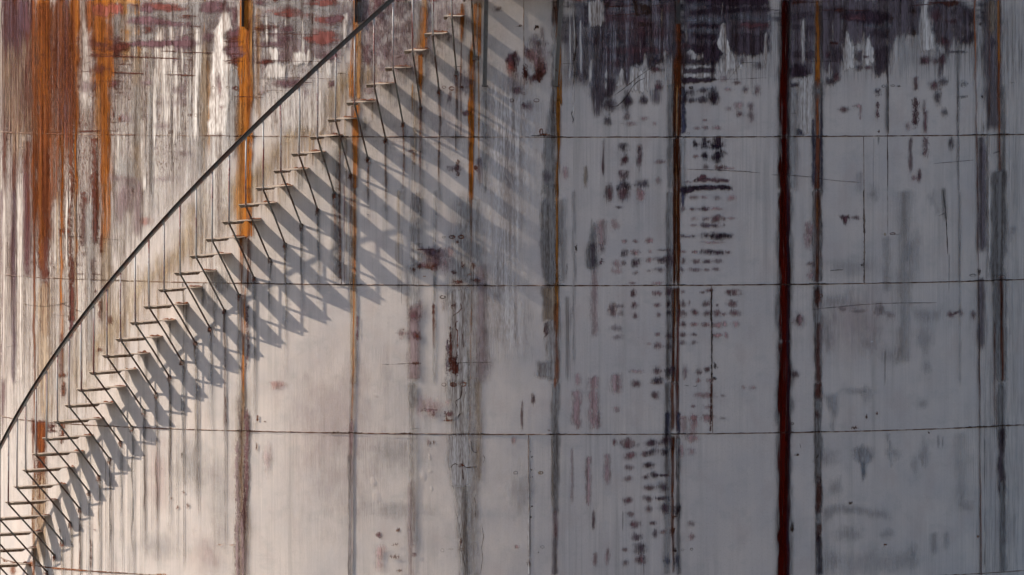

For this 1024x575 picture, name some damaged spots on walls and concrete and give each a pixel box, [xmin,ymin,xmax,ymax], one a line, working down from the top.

rust [1,0,153,575]
rust [200,0,376,575]
rust [395,0,487,238]
rust [505,0,598,386]
rust [581,0,739,566]
rust [757,0,856,575]